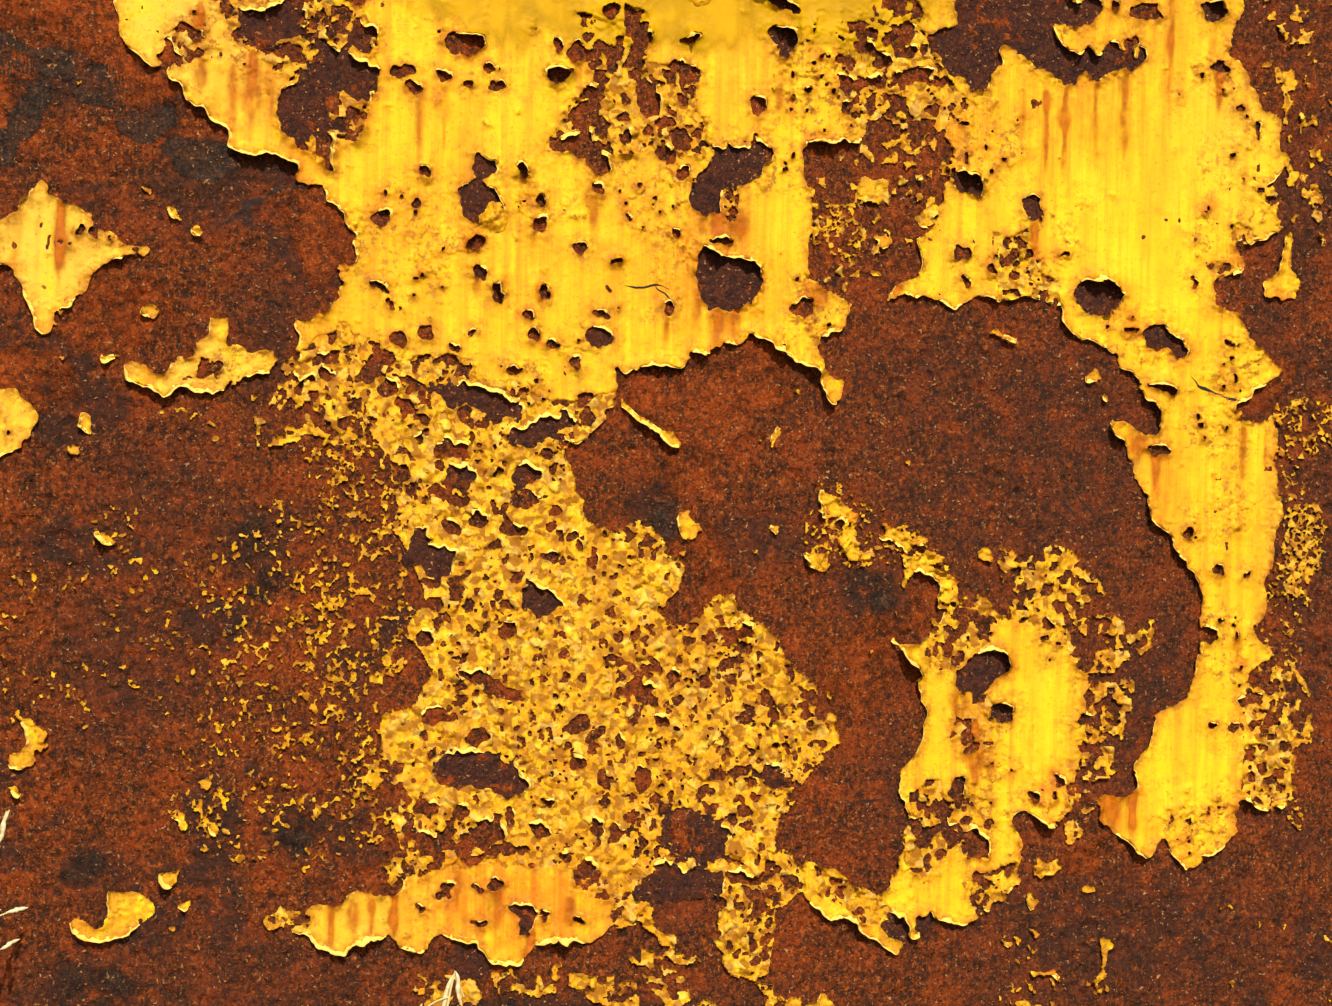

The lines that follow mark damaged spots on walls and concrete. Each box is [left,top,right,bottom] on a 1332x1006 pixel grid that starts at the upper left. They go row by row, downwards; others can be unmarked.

corrosion [0,0,206,115]
corrosion [276,43,379,145]
corrosion [924,0,1147,164]
corrosion [1137,324,1188,359]
peeling [621,397,681,448]
peeling [677,510,702,539]
peeling [217,603,312,691]
corrosion [953,650,1013,785]
corrosion [629,804,729,906]
peeling [411,972,482,1006]
peeling [568,971,639,1006]
peeling [642,965,691,1006]